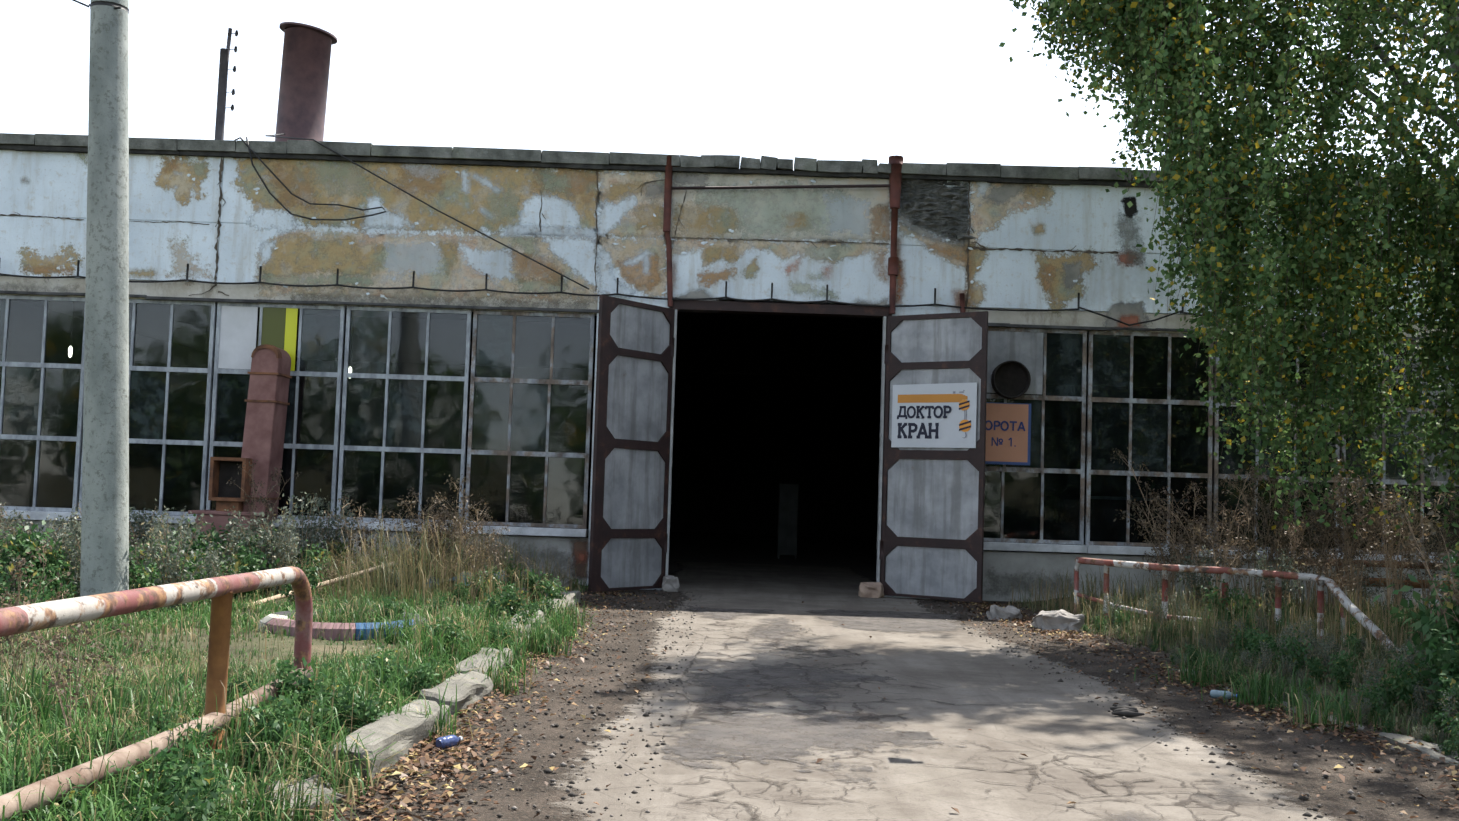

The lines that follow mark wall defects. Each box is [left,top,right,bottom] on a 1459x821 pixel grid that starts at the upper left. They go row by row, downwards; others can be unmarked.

peeling [155,156,209,205]
peeling [18,245,85,281]
peeling [229,158,1055,307]
corrosion [896,247,904,303]
peeling [1035,250,1097,316]
spalling [1118,250,1137,266]